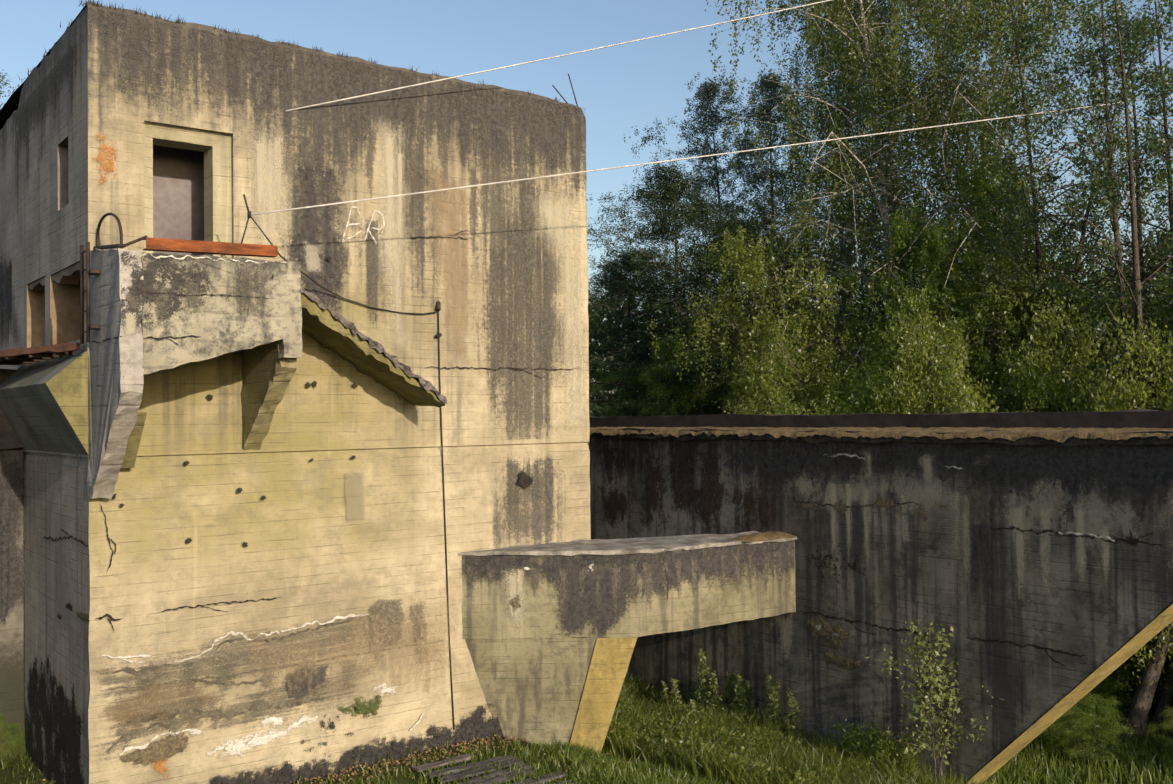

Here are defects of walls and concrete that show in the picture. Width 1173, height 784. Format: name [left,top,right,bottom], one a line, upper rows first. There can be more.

corrosion [96,133,117,184]
water stain [13,7,587,440]
water stain [0,453,25,623]
crack [42,502,116,571]
water stain [462,439,1173,636]
crack [989,526,1163,547]
crack [96,614,123,630]
crack [162,597,279,612]
water stain [96,600,445,759]
spalling [120,732,188,766]